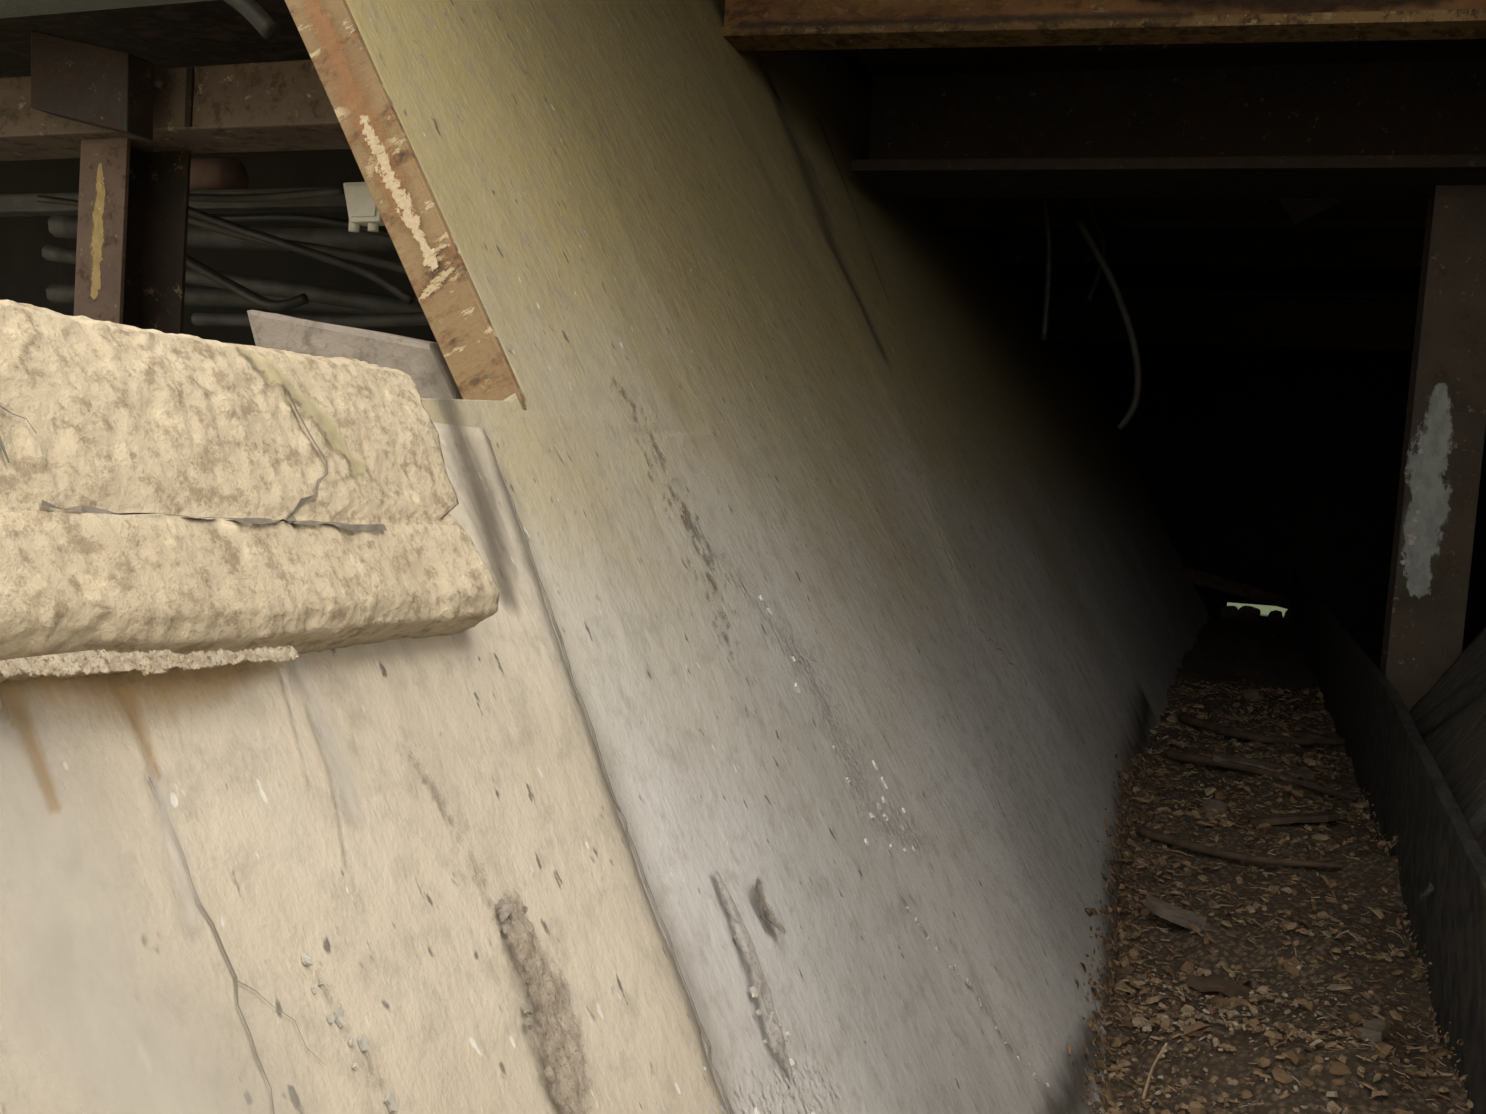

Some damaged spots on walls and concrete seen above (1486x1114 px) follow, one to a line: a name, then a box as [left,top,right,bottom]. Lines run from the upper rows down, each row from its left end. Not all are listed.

corrosion [738,10,1194,29]
corrosion [306,0,414,228]
crack [0,405,36,463]
crack [41,383,387,532]
peeling [1401,383,1457,599]
spalling [0,645,299,678]
spalling [410,751,592,1114]